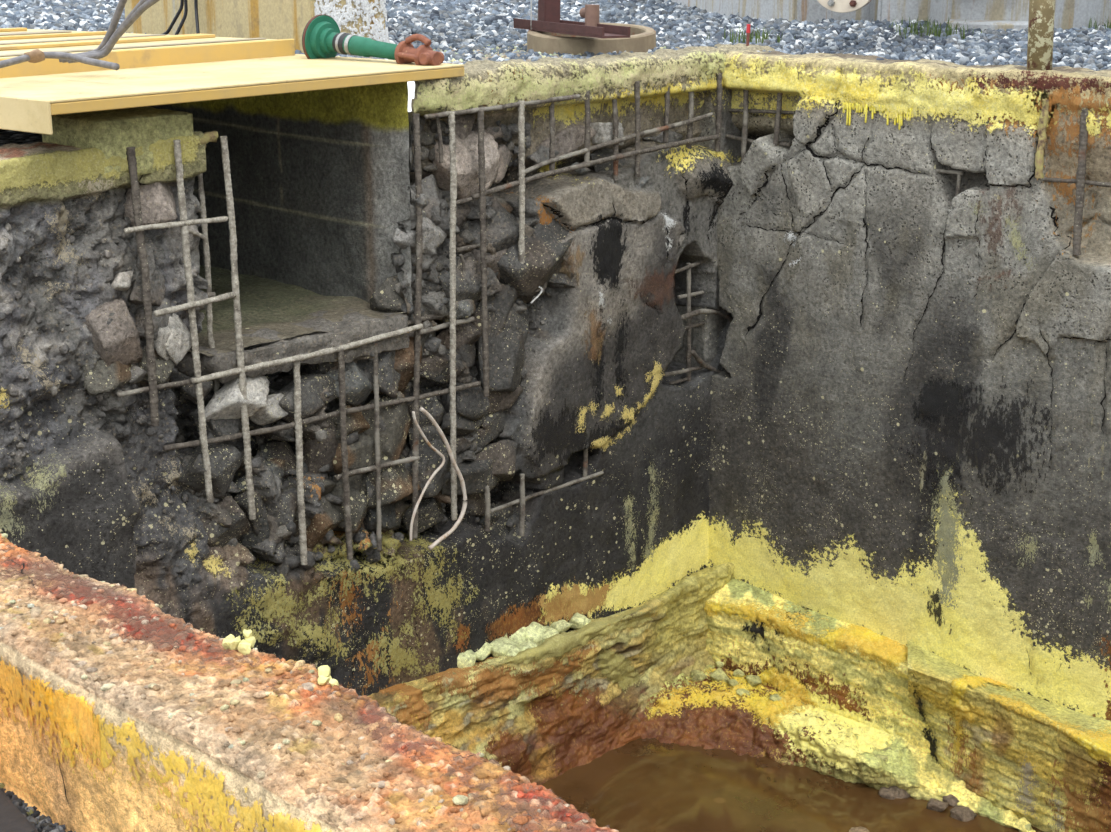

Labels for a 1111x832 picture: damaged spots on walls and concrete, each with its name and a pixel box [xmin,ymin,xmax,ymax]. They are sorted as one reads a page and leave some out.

spalling [74,73,802,577]
leakage [659,209,678,251]
crack [543,103,934,335]
crack [903,211,980,379]
crack [984,106,1040,188]
rust [930,69,1111,259]
crack [994,207,1111,469]
spalling [1032,86,1111,265]
leakage [538,357,1111,720]
rust [314,568,879,783]
rust [1092,637,1111,721]